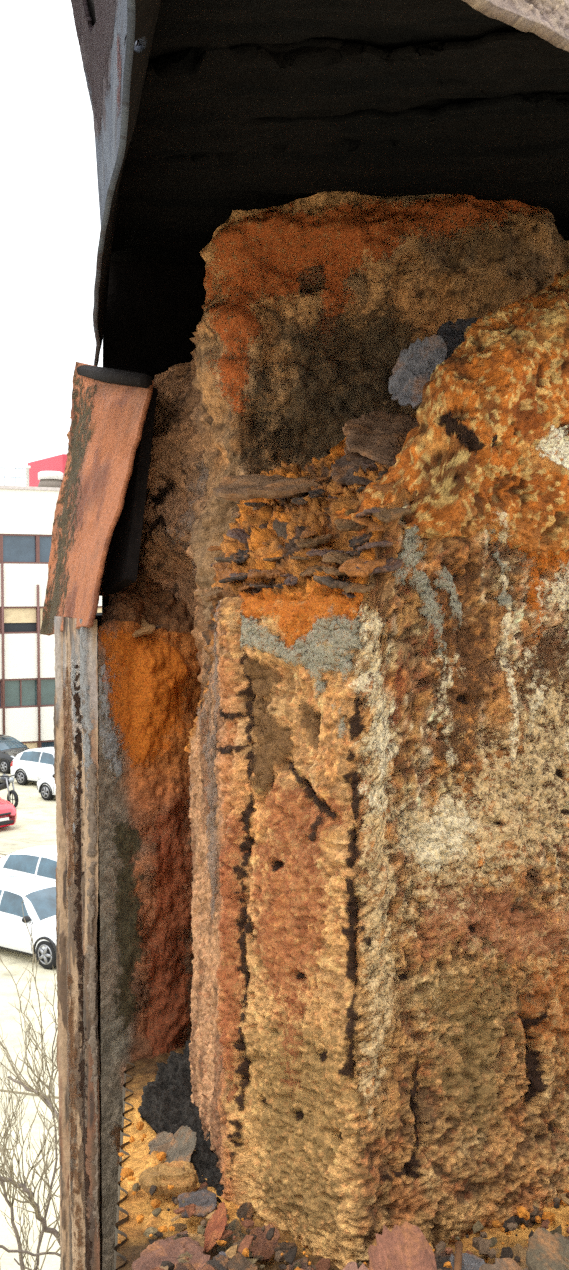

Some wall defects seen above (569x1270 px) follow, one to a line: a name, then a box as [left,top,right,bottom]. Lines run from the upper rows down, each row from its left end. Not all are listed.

water stain [535,425,569,469]
water stain [71,619,94,801]
rust [98,618,189,776]
water stain [239,512,569,1121]